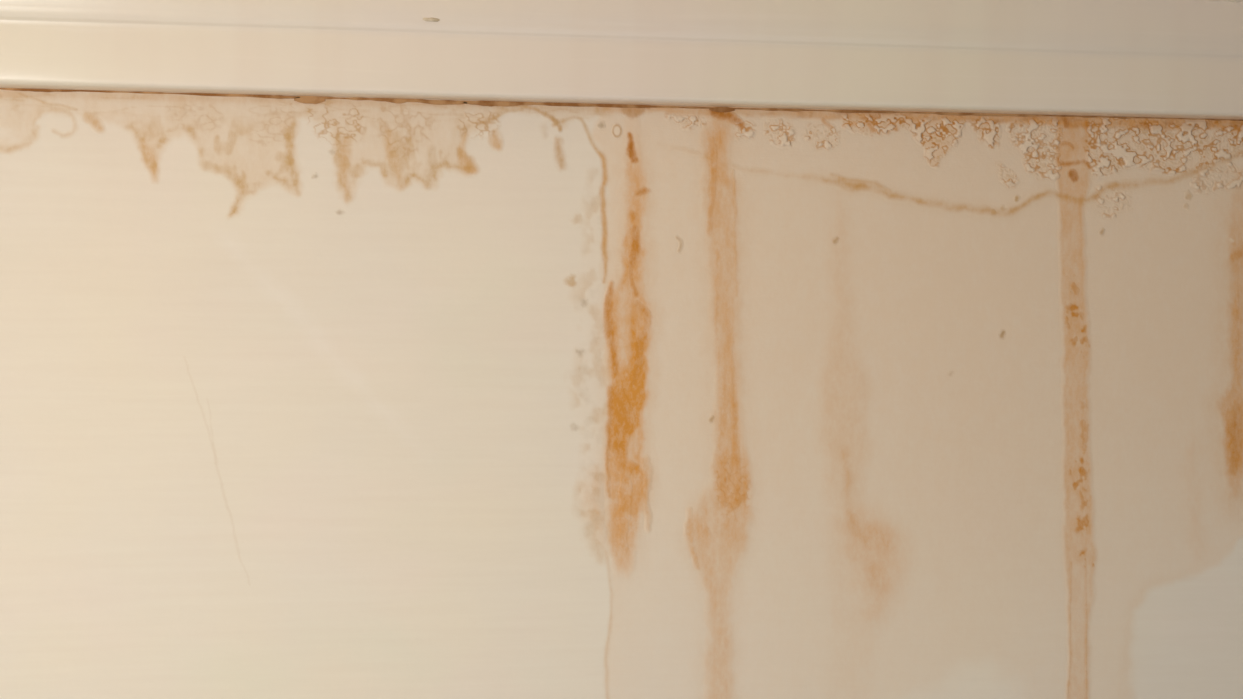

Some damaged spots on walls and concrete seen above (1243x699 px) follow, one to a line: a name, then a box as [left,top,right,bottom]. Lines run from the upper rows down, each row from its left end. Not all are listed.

water stain [0,90,711,699]
water stain [730,117,1067,699]
water stain [1084,148,1243,699]